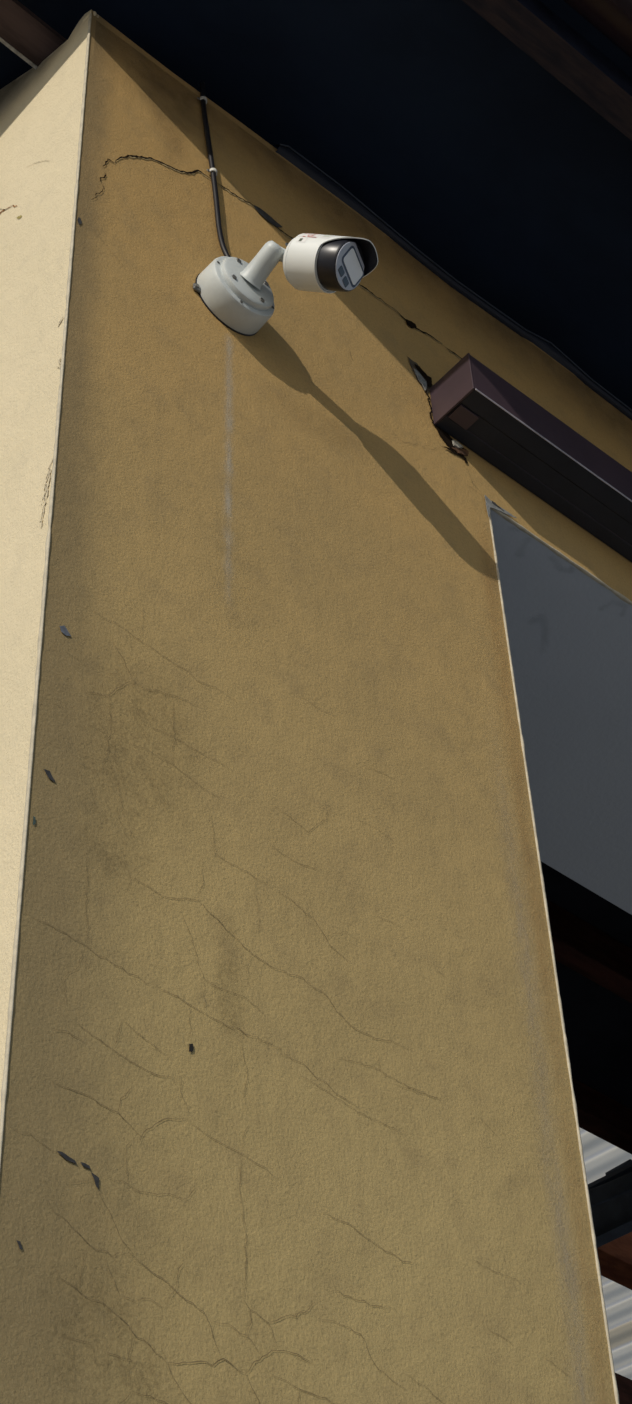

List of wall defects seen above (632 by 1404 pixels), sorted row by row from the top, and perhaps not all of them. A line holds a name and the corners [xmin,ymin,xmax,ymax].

crack [91,155,294,239]
crack [358,284,462,359]
spalling [408,357,469,463]
crack [30,606,441,1404]